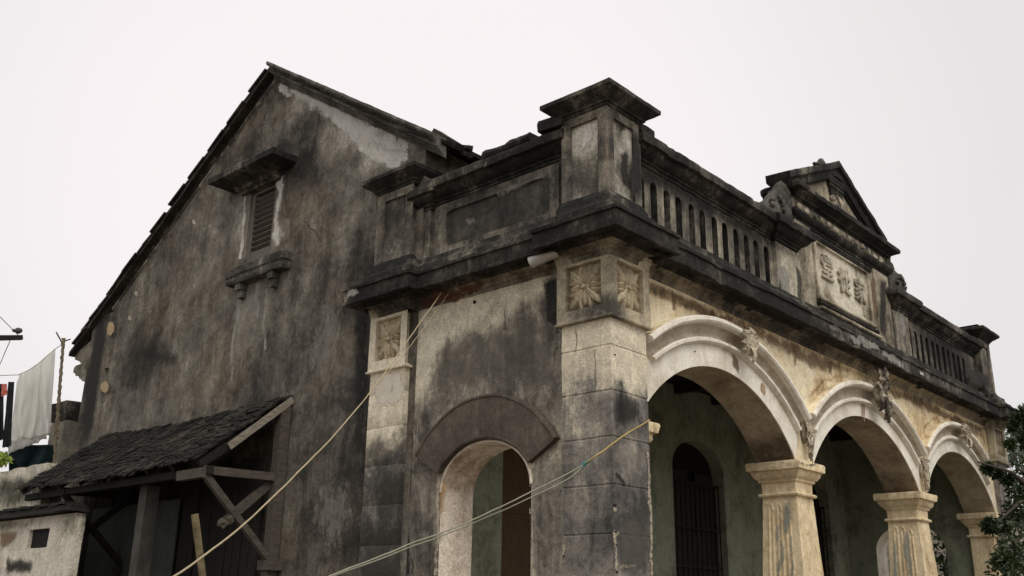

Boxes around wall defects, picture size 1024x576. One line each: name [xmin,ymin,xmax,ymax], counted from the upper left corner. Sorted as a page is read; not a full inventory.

peeling [279,83,408,169]
leakage [238,196,247,259]
leakage [272,175,284,246]
leakage [544,278,557,325]
leakage [777,264,801,299]
leakage [870,279,906,336]
leakage [671,291,847,393]
leakage [619,382,639,421]